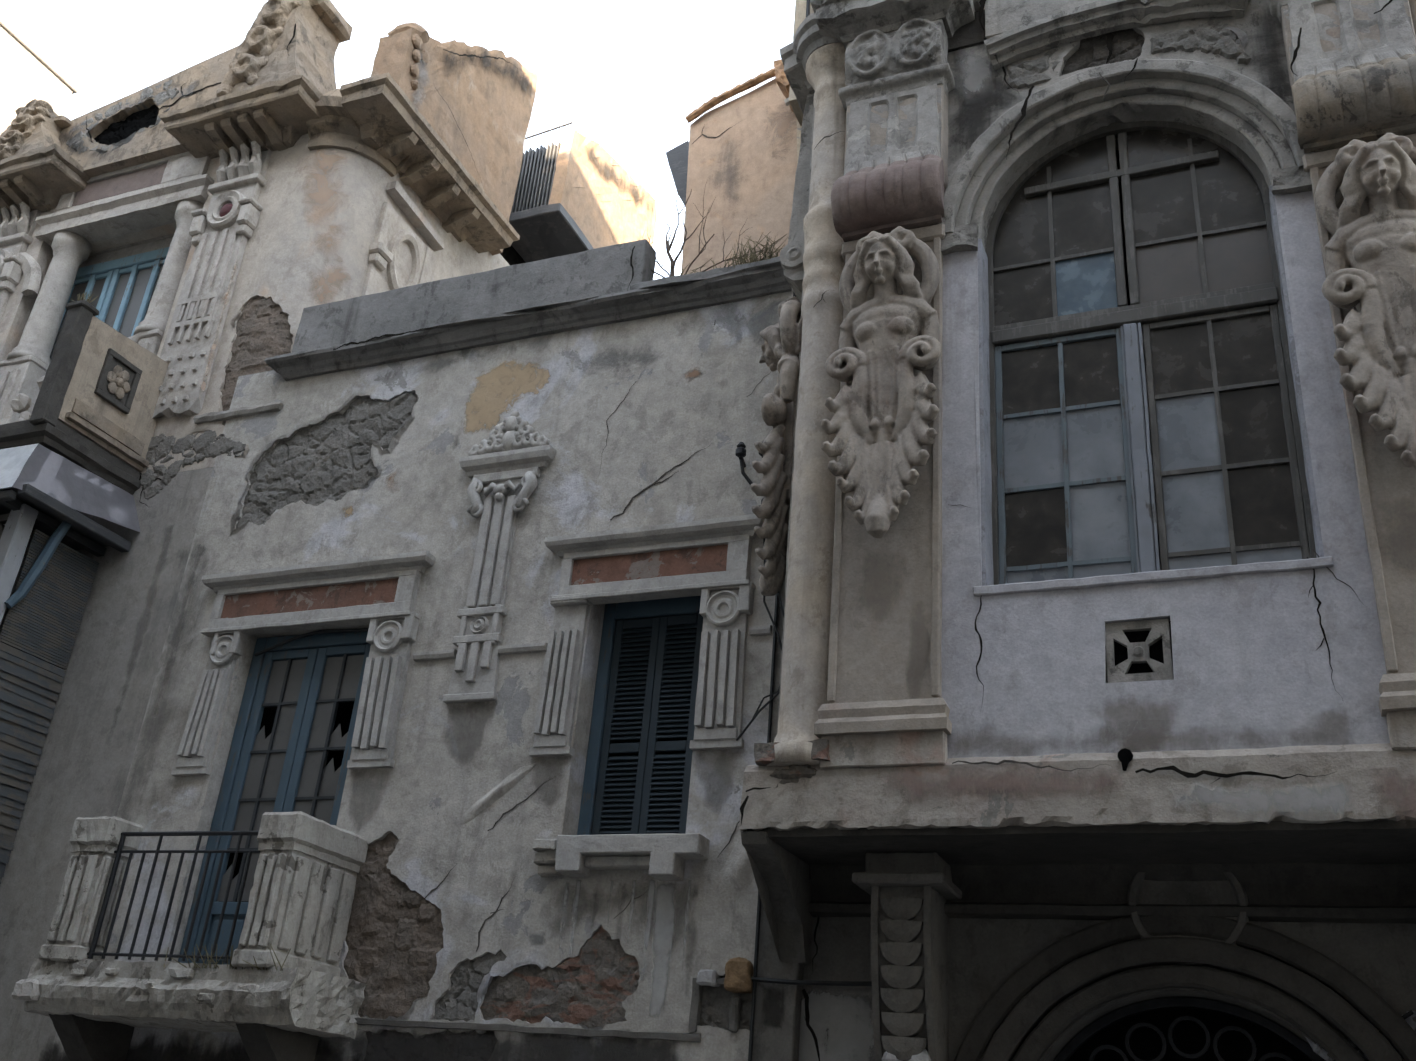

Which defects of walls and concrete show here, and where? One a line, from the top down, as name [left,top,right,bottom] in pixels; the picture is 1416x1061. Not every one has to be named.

flaking render [66,80,179,154]
flaking render [140,297,419,536]
crack [610,446,709,521]
crack [975,596,984,702]
crack [1307,549,1364,700]
crack [952,760,1335,783]
flaking render [344,832,640,1040]